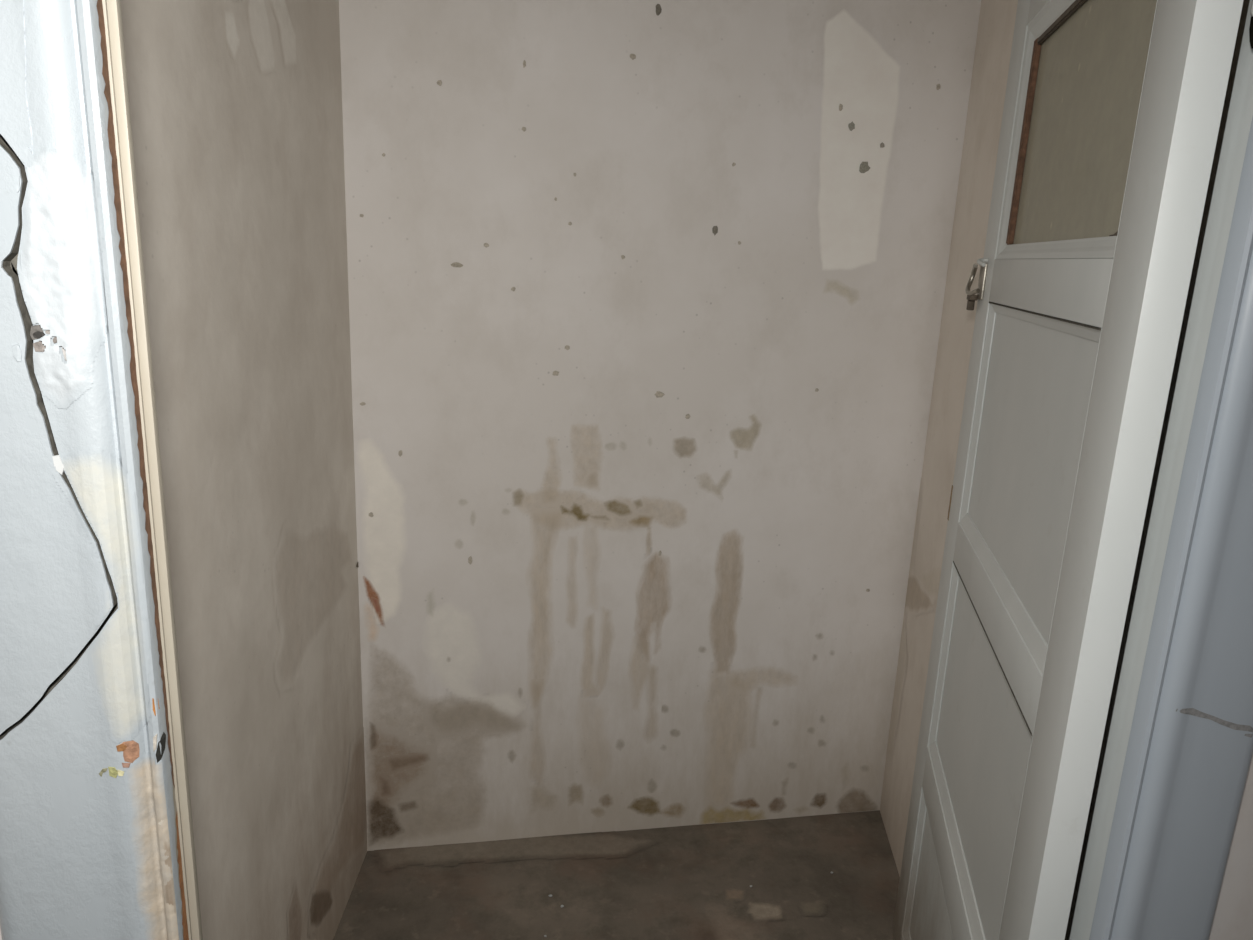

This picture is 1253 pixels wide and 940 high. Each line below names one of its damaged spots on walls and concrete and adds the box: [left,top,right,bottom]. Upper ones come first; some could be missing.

peeling [30,325,67,361]
crack [0,0,118,739]
rust [360,574,389,645]
leakage [314,411,830,892]
crack [1176,708,1253,738]